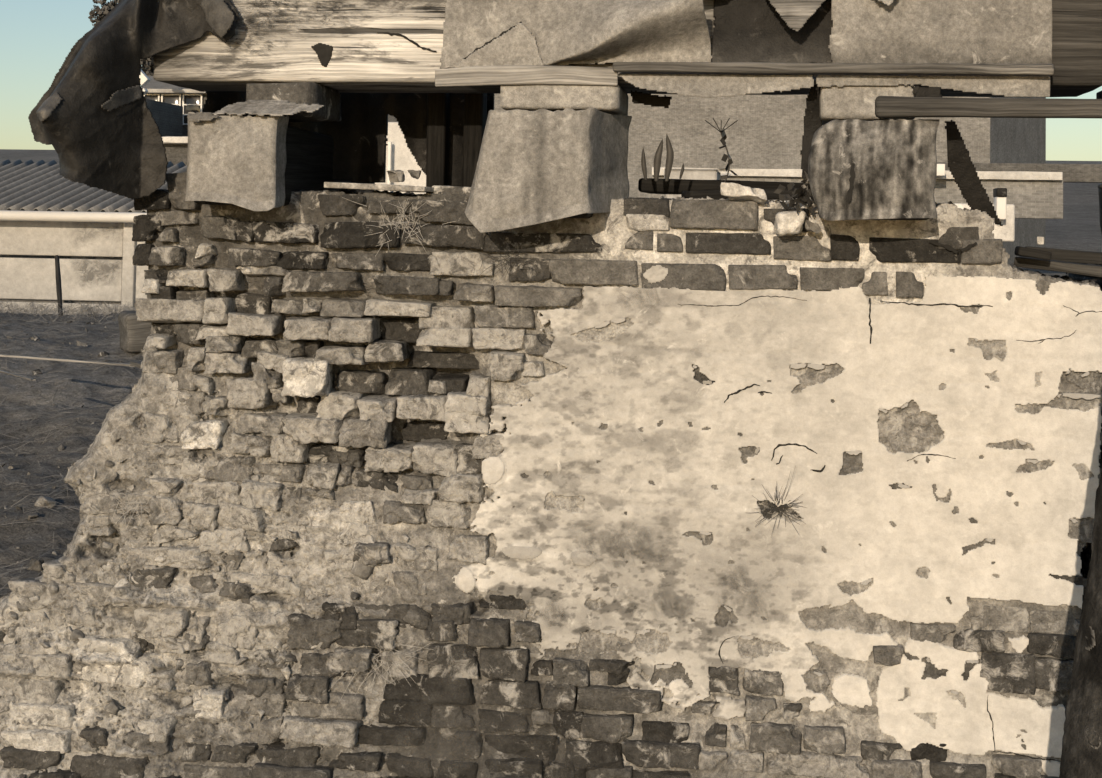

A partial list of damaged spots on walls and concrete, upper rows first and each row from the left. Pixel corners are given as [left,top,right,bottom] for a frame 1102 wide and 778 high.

crack [679,296,807,307]
crack [869,298,993,344]
spalling [790,363,844,394]
peeling [967,338,1007,389]
spalling [1015,369,1102,414]
spalling [878,400,944,464]
spalling [839,451,863,475]
spalling [979,439,1055,473]
spalling [1049,574,1087,588]
spalling [631,623,693,688]
flaking render [904,652,948,680]
flaking render [946,659,980,708]